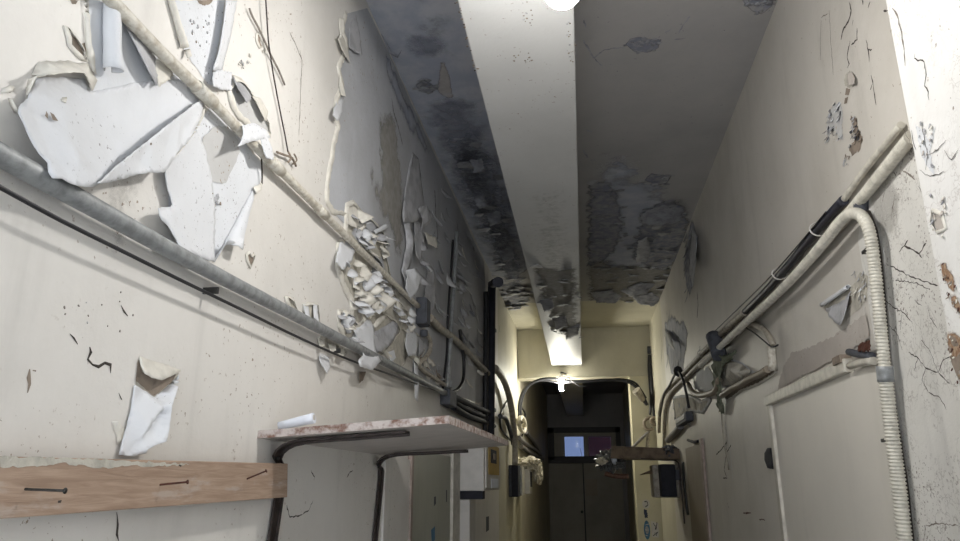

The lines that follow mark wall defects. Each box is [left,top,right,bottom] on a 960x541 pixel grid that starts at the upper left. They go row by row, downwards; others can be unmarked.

peeling [7,0,274,269]